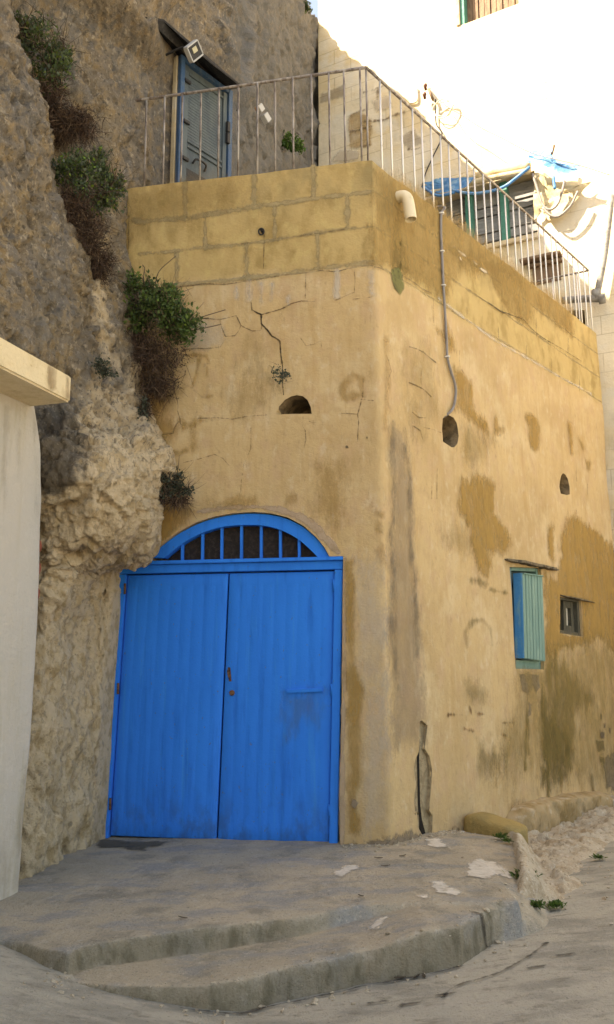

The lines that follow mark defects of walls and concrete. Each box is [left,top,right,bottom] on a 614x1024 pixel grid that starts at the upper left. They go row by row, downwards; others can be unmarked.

crack [180,229,432,395]
damp [527,415,540,450]
damp [459,473,510,574]
damp [346,562,354,643]
damp [506,517,614,797]
damp [346,667,363,832]
crack [413,720,433,836]
damp [98,839,164,851]